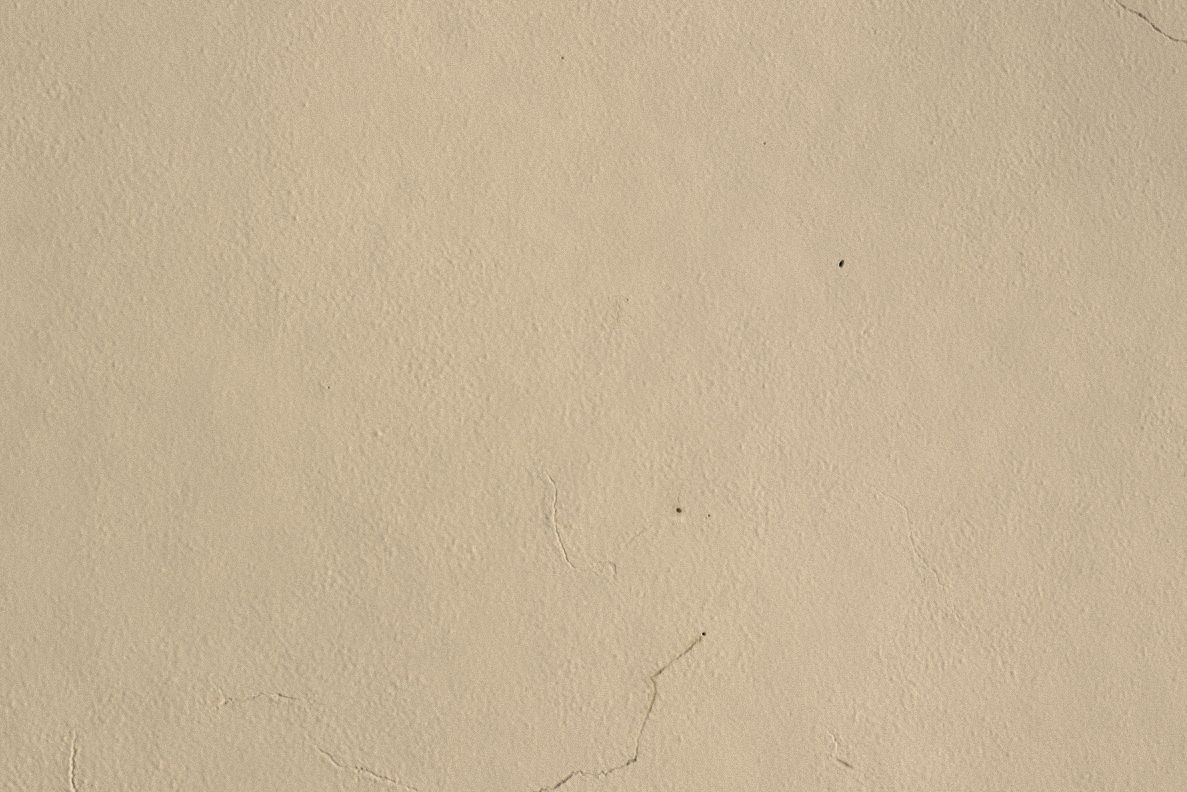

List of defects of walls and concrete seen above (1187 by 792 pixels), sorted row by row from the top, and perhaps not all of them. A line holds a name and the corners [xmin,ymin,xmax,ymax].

crack [1103,0,1187,53]
crack [515,625,713,792]
crack [303,734,435,792]